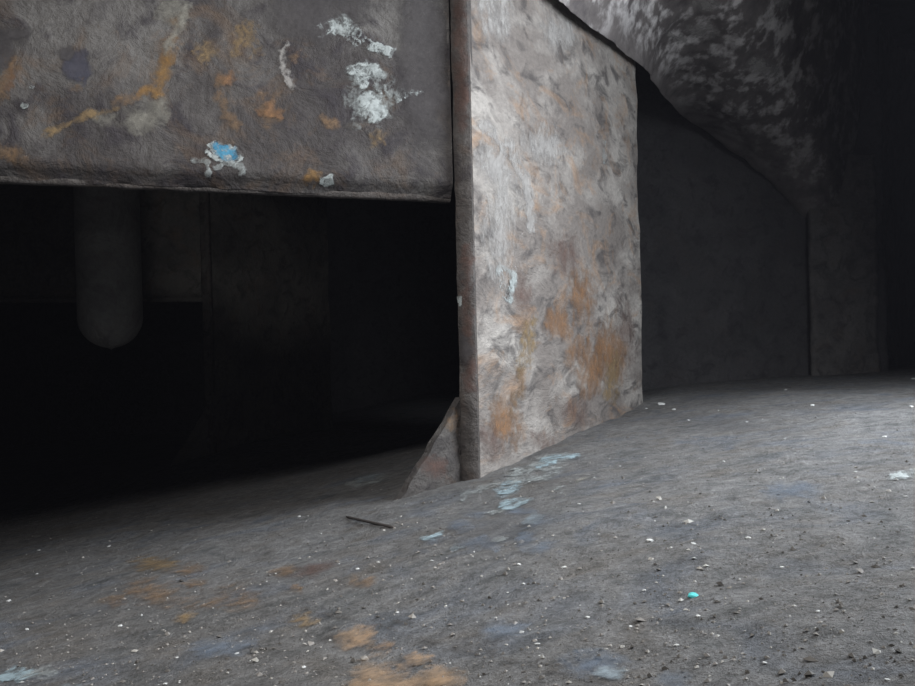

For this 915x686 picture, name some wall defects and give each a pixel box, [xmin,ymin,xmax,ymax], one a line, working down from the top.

water stain [273,0,368,42]
water stain [397,0,451,140]
peeling [204,142,245,177]
corrosion [460,333,473,364]